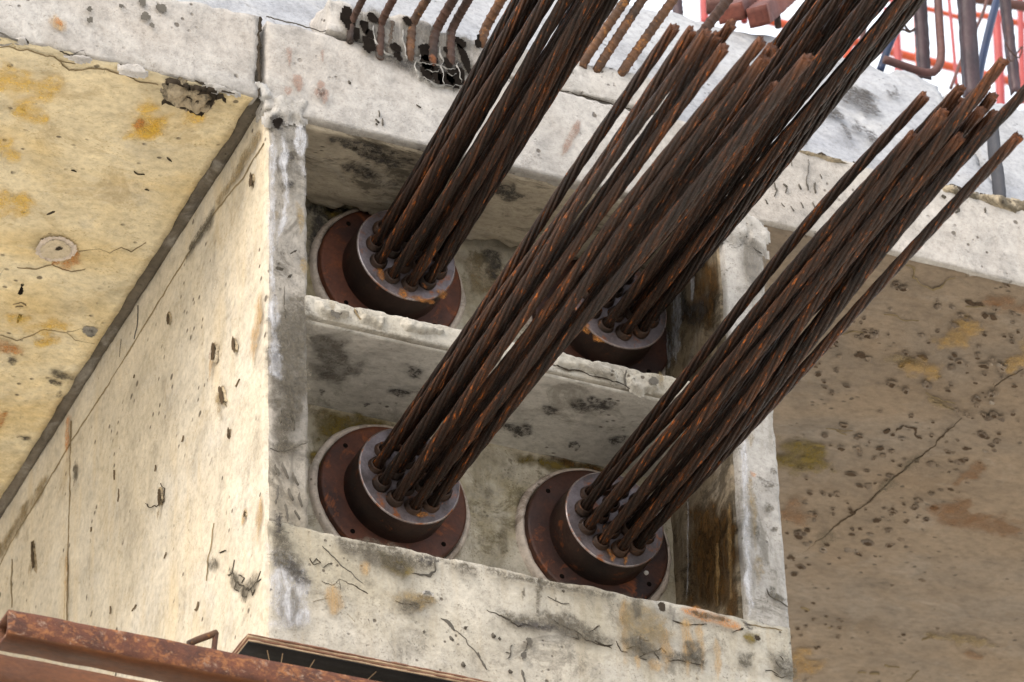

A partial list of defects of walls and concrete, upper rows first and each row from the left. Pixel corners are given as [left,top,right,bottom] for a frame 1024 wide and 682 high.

spalling [160,77,226,117]
rust [127,105,166,138]
damp [329,137,414,178]
damp [268,126,348,287]
damp [495,185,524,202]
crack [17,243,146,272]
crack [0,329,95,344]
damp [251,296,385,469]
damp [687,438,834,616]
crack [441,618,533,682]